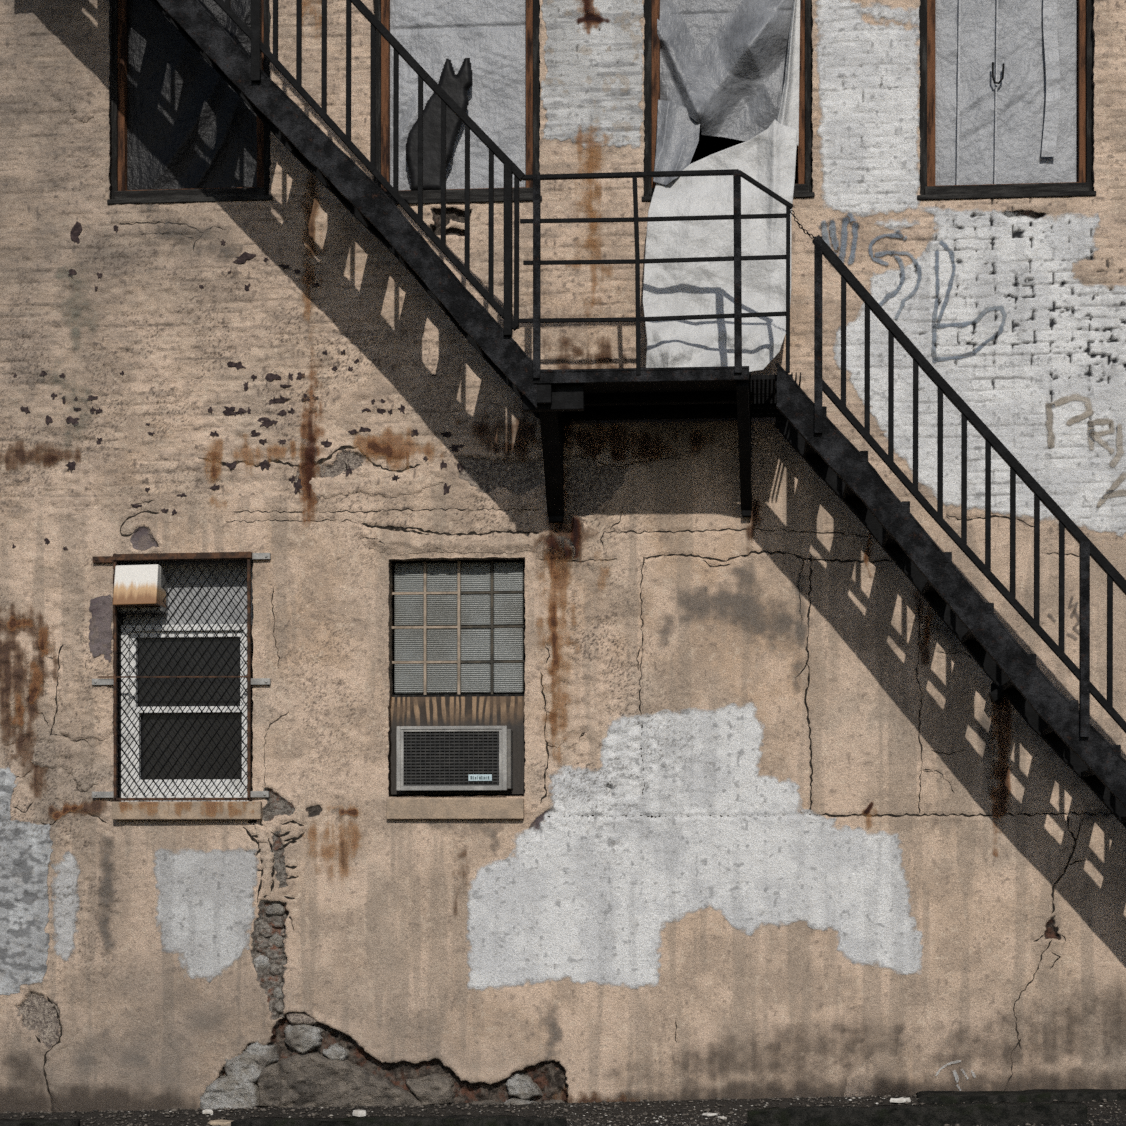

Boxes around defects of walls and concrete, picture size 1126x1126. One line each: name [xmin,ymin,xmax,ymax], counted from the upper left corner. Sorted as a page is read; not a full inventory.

corrosion [577,0,609,34]
spalling [1003,210,1047,219]
corrosion [206,370,324,522]
corrosion [537,466,589,734]
corrosion [0,605,57,797]
corrosion [49,799,106,819]
flaking render [529,809,553,830]
crack [226,508,1099,1080]
corrosion [991,695,1011,819]
peeling [0,767,62,1049]
flaking render [251,786,323,1020]
crack [35,997,62,1111]